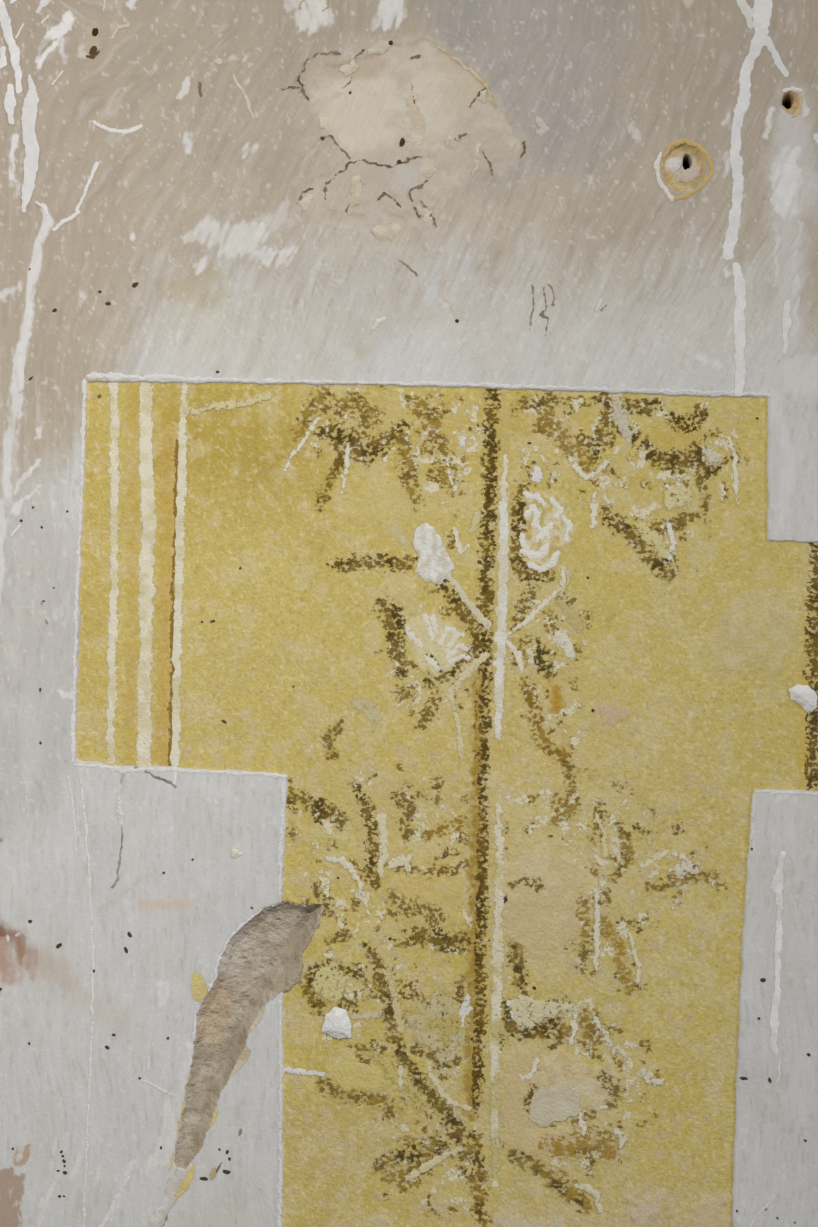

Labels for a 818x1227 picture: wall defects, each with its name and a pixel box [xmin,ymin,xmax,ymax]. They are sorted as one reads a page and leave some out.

crack [0,0,99,661]
flaking render [179,0,536,277]
crack [690,0,789,398]
flaking render [159,901,325,1204]